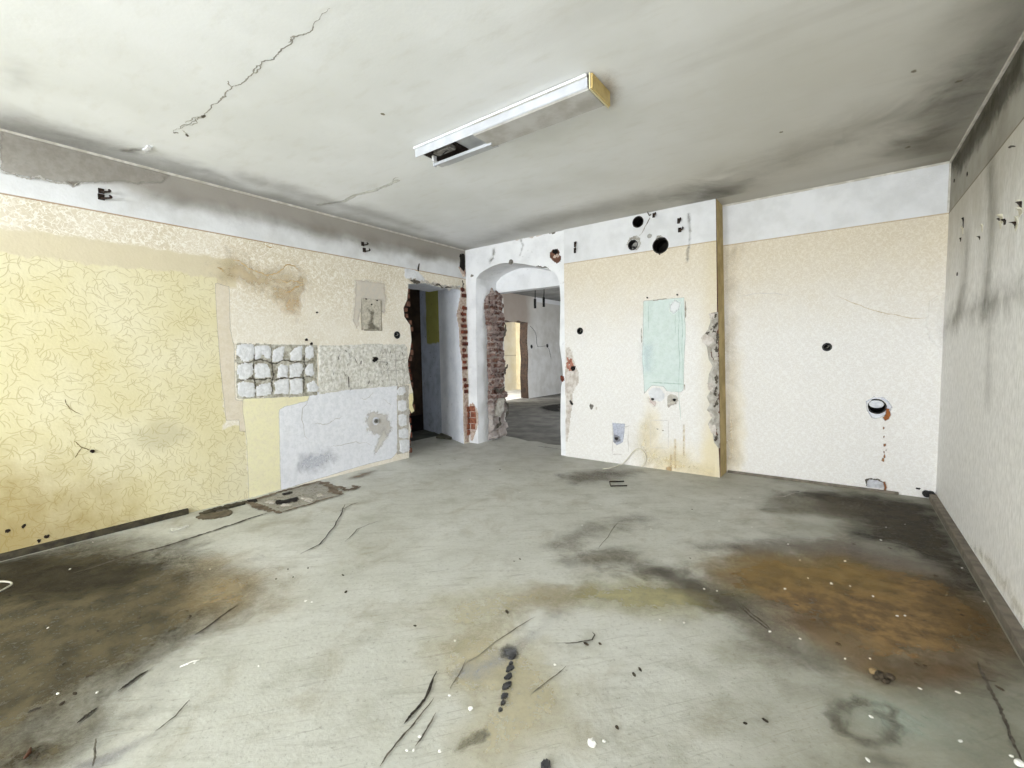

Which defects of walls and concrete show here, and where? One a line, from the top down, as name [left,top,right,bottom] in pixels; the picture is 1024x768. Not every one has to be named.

crack [173,8,330,137]
peeling [0,132,168,187]
flaking render [243,254,478,505]
spalling [701,312,720,448]
water stain [0,540,249,768]
crack [977,661,1022,760]